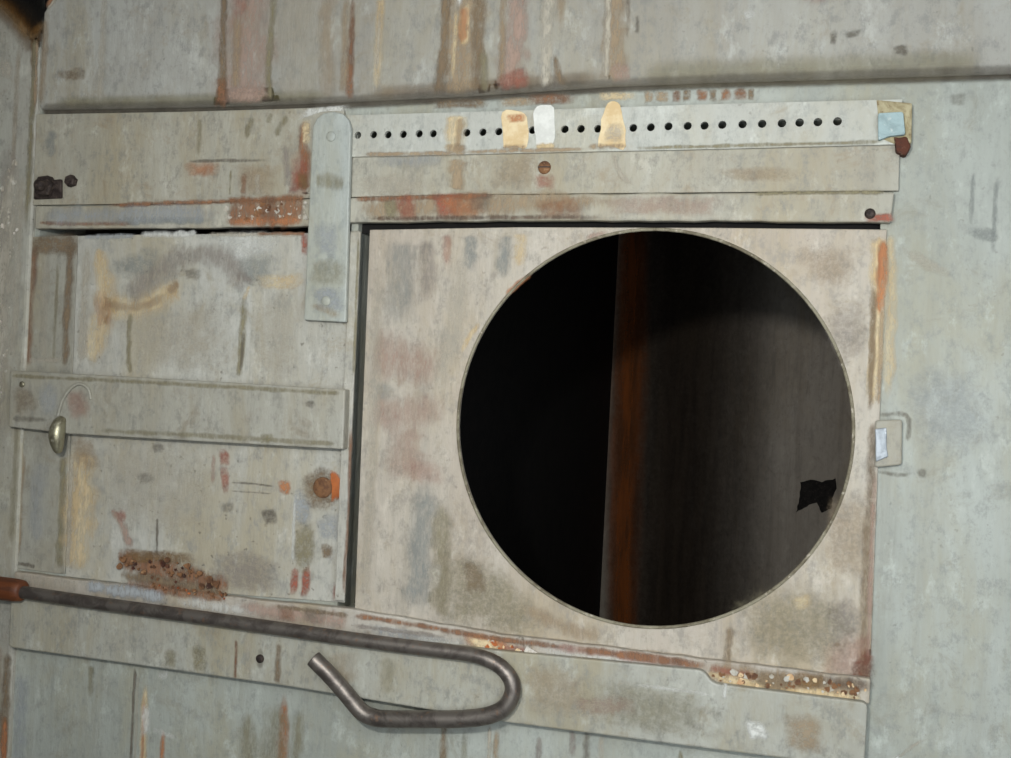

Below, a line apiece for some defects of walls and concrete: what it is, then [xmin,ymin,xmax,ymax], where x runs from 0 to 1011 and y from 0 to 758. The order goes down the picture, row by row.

rust [217,0,275,104]
rust [343,7,354,95]
rust [118,106,342,207]
rust [868,239,887,402]
rust [280,438,352,595]
rust [357,615,555,647]
rust [586,648,699,668]